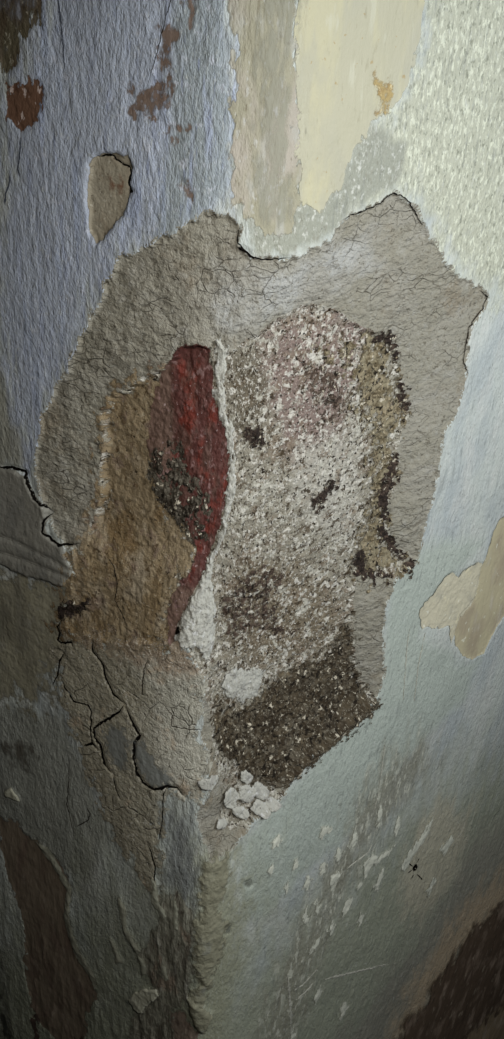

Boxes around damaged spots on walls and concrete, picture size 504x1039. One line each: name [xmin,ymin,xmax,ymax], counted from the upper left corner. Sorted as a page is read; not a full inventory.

peeling [0,0,44,203]
peeling [127,0,195,123]
peeling [227,0,425,237]
flaking render [87,153,133,243]
crack [0,466,79,547]
crack [108,558,127,625]
flaking render [0,189,490,871]
peeling [419,517,504,660]
crack [53,621,202,882]
leakage [207,611,384,800]
peeling [309,816,400,955]
leakage [400,902,504,1039]